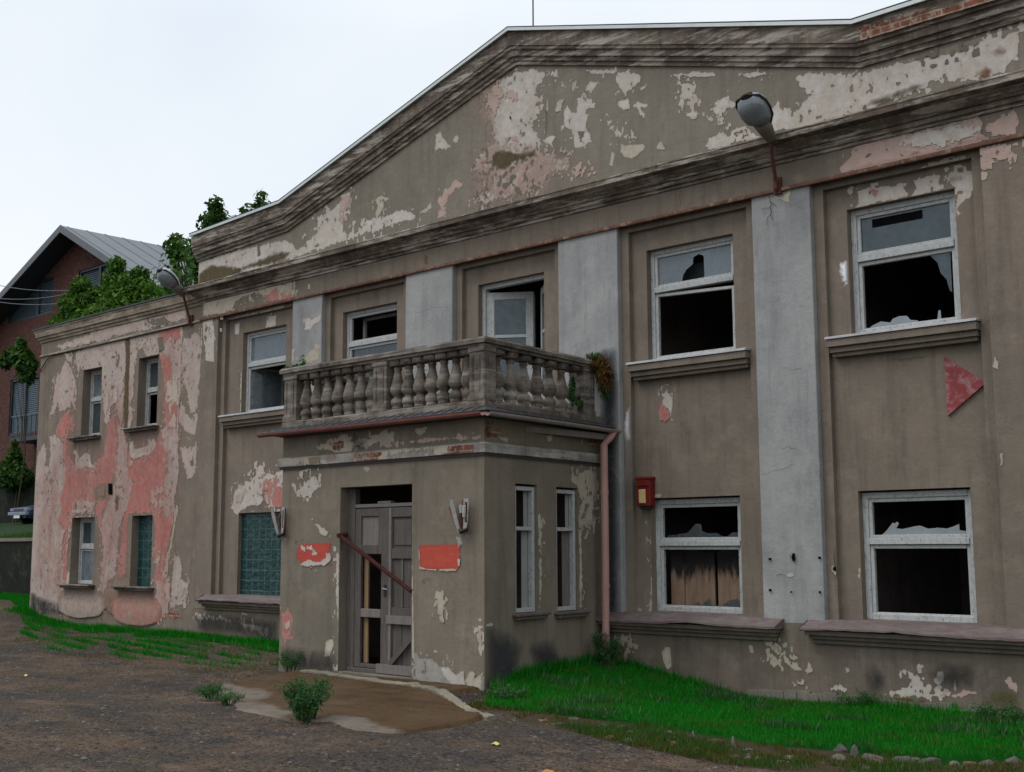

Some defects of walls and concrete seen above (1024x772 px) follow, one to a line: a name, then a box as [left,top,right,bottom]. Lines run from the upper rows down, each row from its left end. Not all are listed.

peeling [198,66,665,284]
peeling [670,71,759,150]
peeling [771,21,1024,131]
peeling [839,110,1024,215]
peeling [658,384,675,422]
peeling [30,281,310,638]
peeling [230,421,508,517]
peeling [570,464,600,609]
flaking render [411,544,484,691]
peeling [749,638,813,690]
peeling [884,664,977,703]